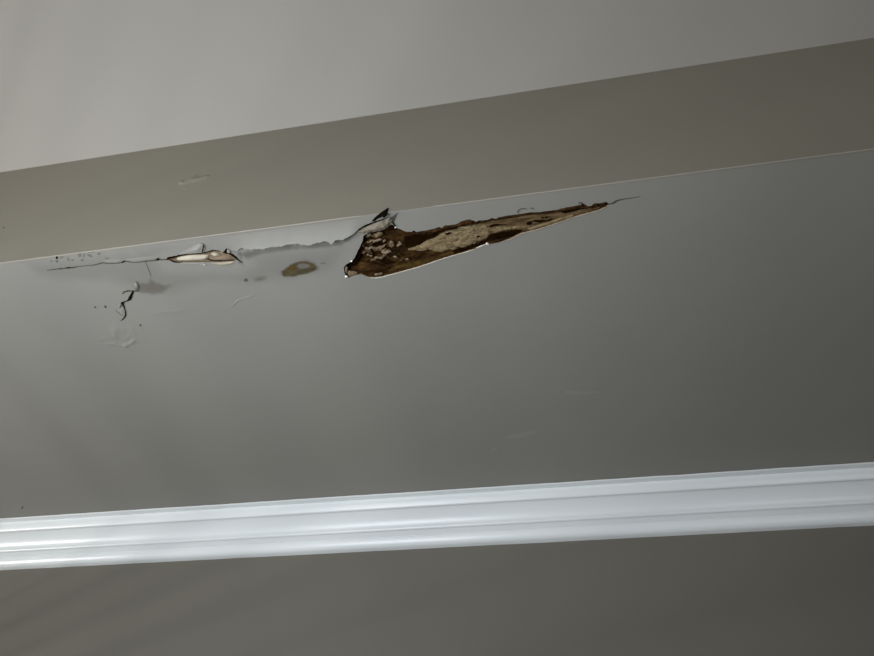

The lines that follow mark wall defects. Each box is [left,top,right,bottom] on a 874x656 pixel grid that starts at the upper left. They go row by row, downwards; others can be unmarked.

peeling [167,202,608,266]
crack [47,256,167,320]
leakage [282,261,316,276]